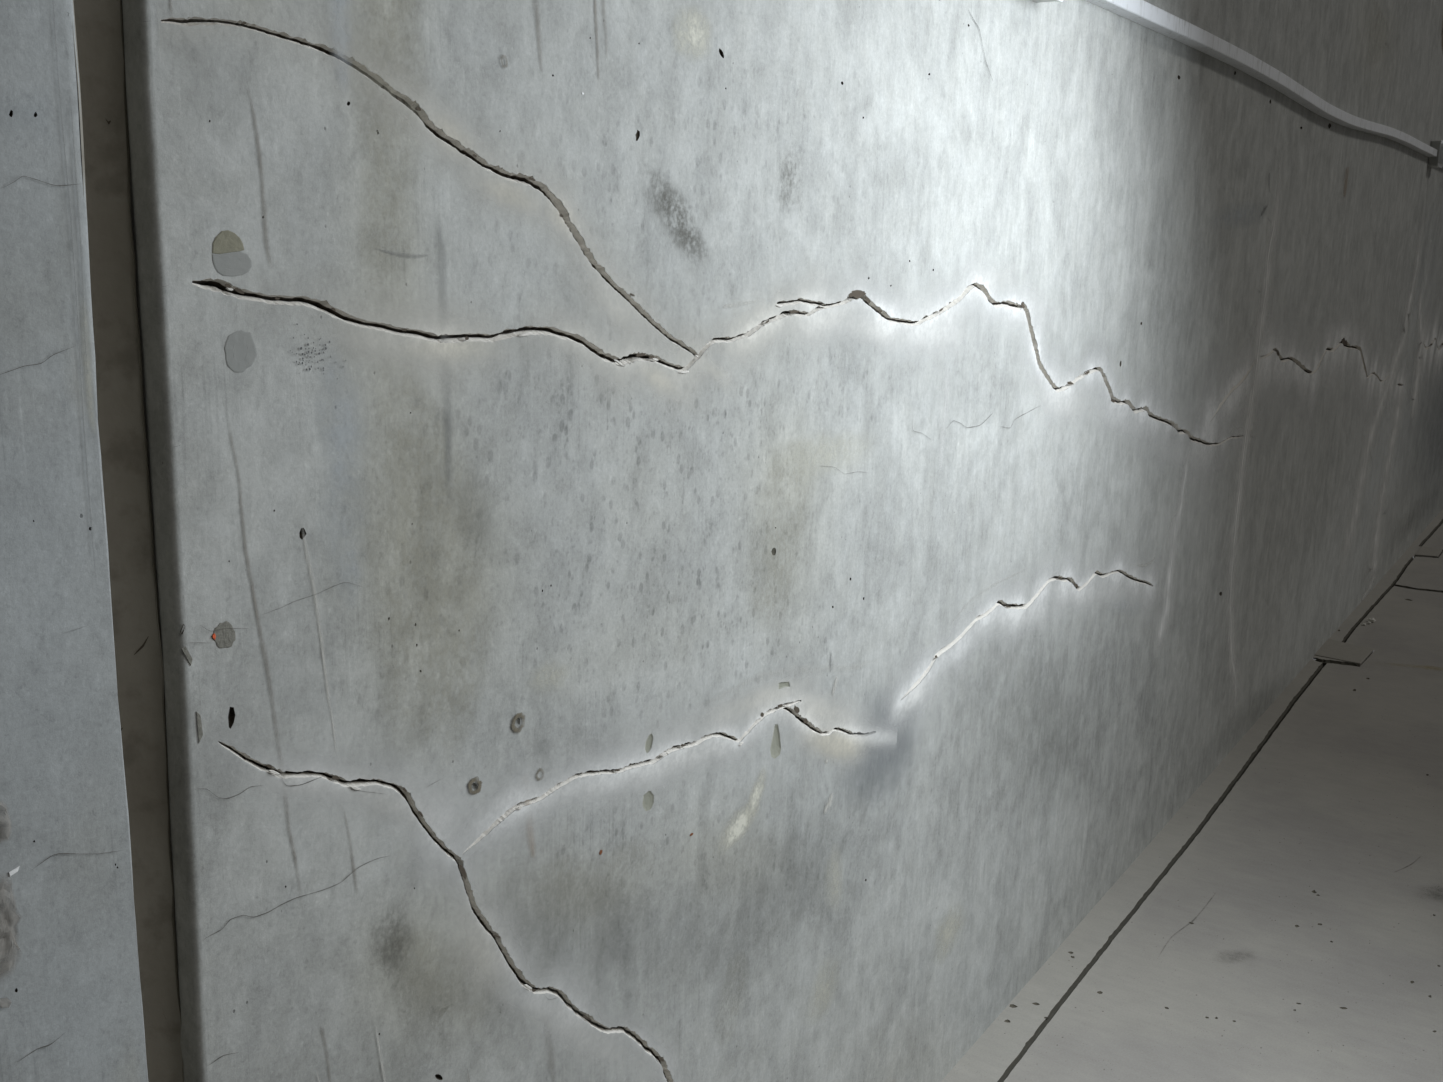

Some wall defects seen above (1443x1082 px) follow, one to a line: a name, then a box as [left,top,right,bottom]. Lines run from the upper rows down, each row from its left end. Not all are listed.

crack [144,17,1443,476]
crack [202,554,1157,1082]